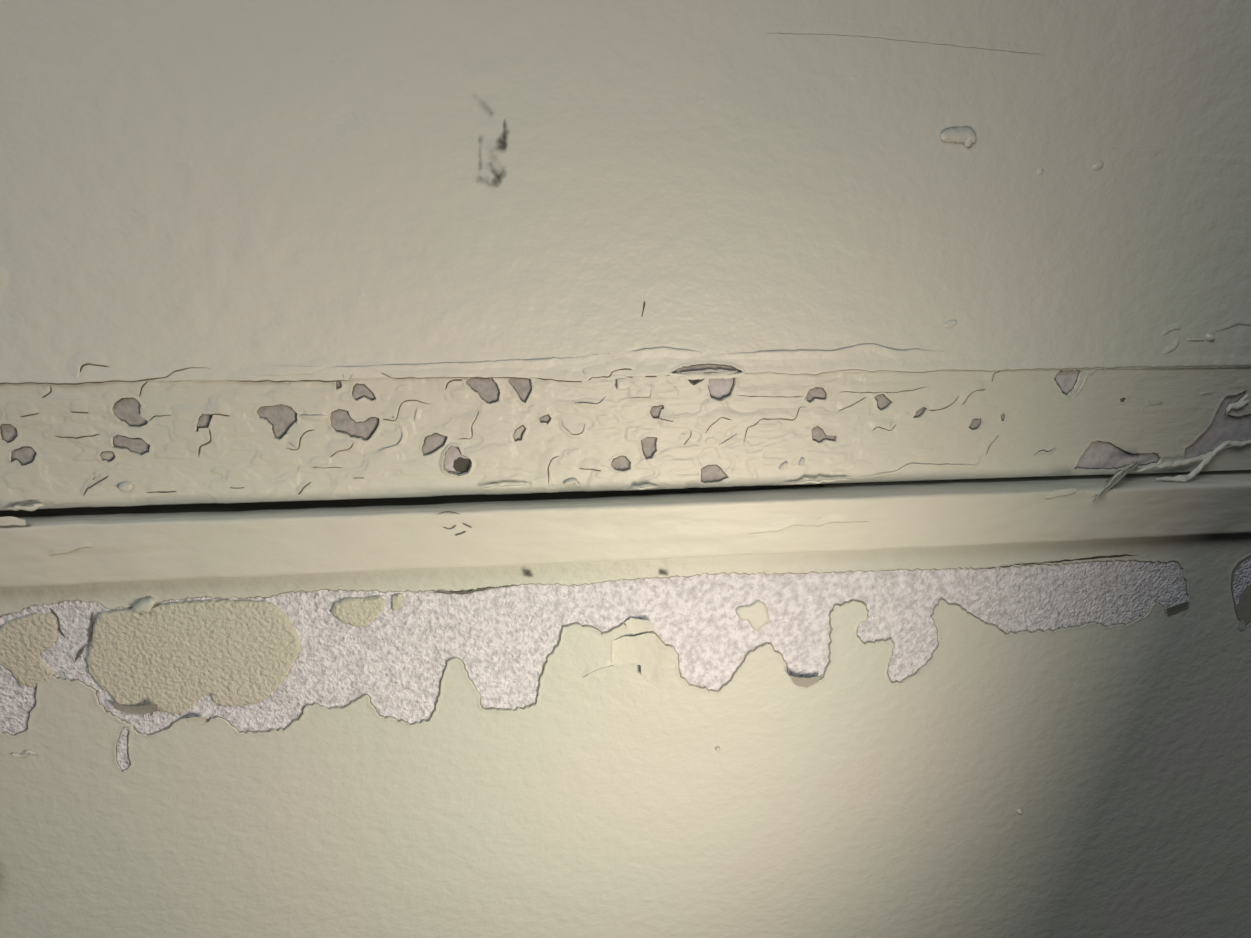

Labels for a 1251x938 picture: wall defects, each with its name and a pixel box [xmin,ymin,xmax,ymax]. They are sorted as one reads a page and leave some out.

peeling [0,384,52,468]
peeling [55,381,154,496]
peeling [185,402,231,457]
peeling [252,375,588,495]
peeling [697,462,731,486]
peeling [575,361,1000,474]
peeling [966,410,1009,432]
peeling [1073,438,1165,473]
peeling [1182,388,1251,460]
peeling [1228,553,1251,631]
peeling [0,557,1192,774]